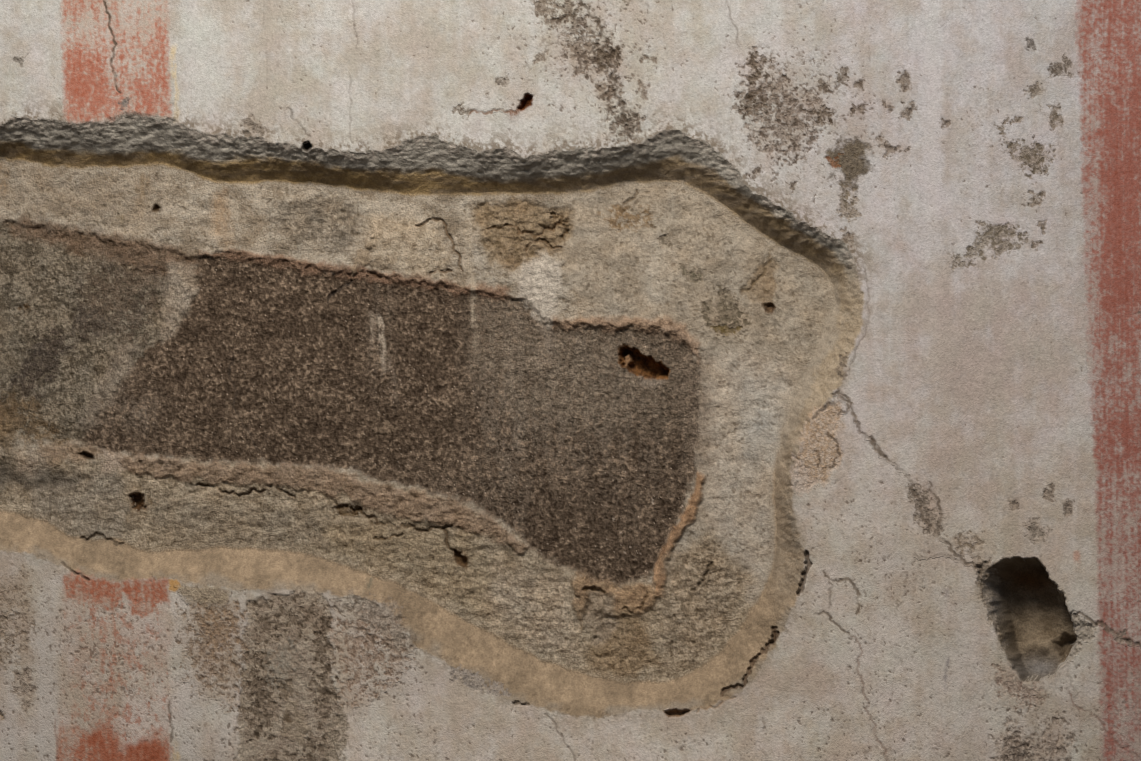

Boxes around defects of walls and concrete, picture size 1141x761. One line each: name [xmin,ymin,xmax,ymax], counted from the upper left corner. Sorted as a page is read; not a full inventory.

crack [102,0,132,111]
spalling [849,69,919,121]
spalling [868,135,911,159]
spalling [947,53,1080,273]
spalling [1024,36,1037,52]
spalling [0,0,865,761]
crack [831,260,984,577]
peeling [905,479,1096,761]